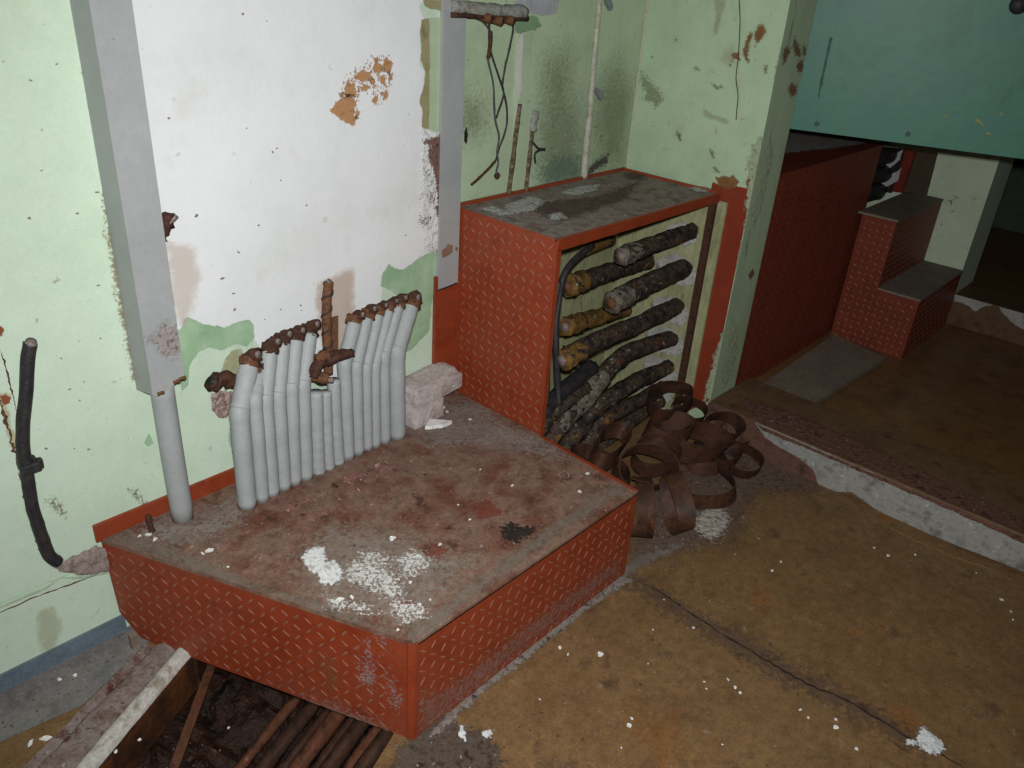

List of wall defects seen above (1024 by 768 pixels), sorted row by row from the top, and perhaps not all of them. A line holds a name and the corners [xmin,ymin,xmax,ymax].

peeling [330,55,396,128]
rust [731,24,766,62]
rust [774,40,807,96]
peeling [381,0,441,351]
flaking render [736,137,773,268]
peeling [178,308,266,390]
rust [0,394,16,451]
spalling [703,317,1024,571]
crack [628,578,964,768]